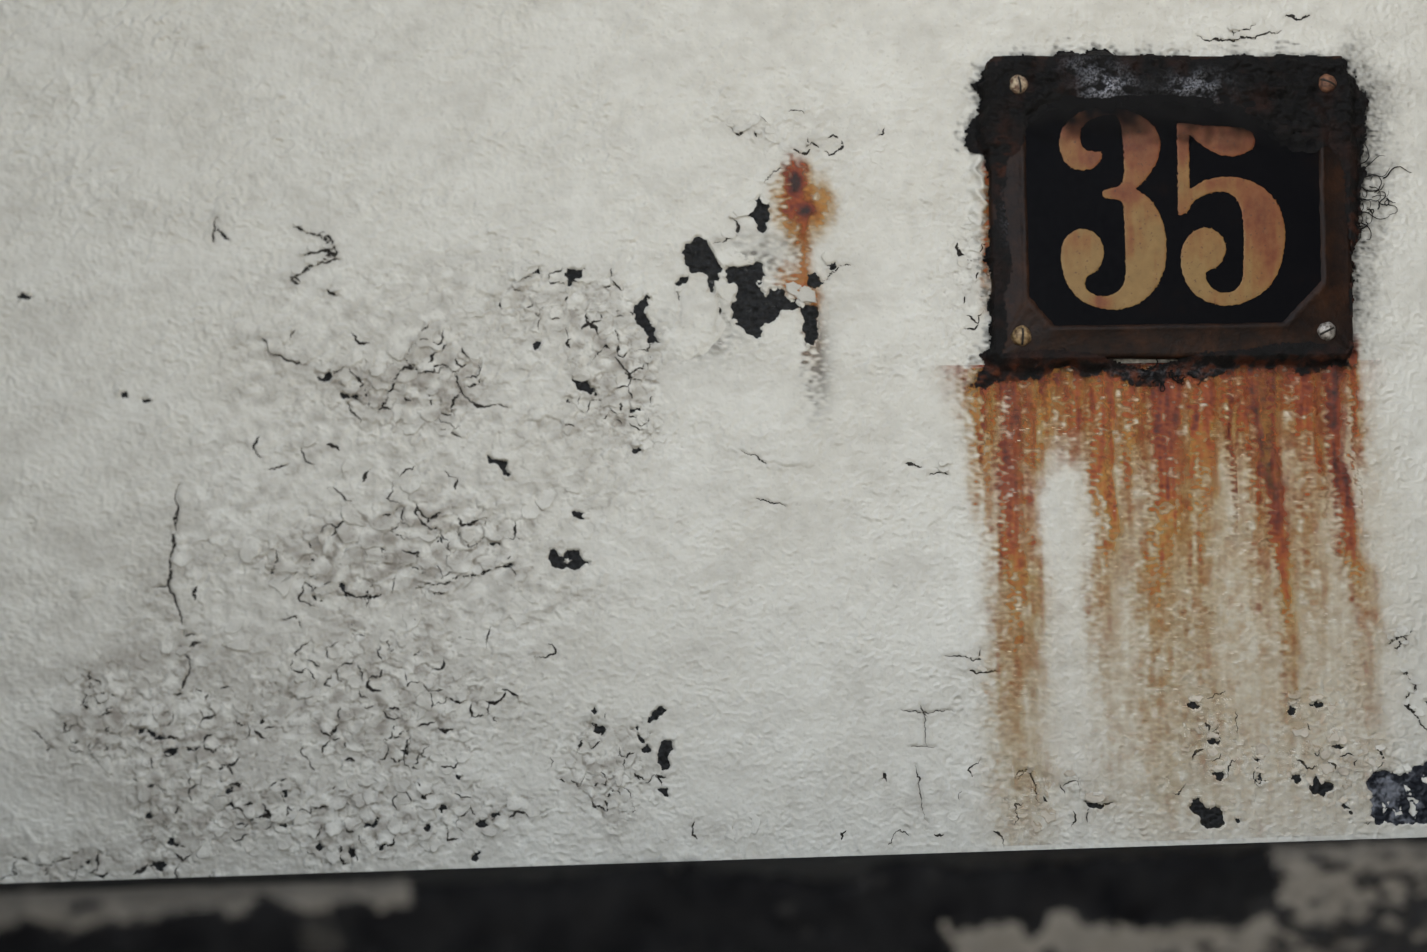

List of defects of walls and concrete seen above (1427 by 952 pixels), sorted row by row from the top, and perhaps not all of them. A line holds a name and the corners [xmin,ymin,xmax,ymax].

crack [212,217,229,242]
crack [290,219,340,296]
peeling [733,193,770,233]
peeling [675,237,841,349]
rust [770,160,833,307]
rust [981,162,990,280]
crack [268,332,506,437]
crack [152,484,203,696]
crack [272,528,381,636]
crack [380,504,520,595]
rust [957,341,1375,695]
peeling [939,687,1427,952]